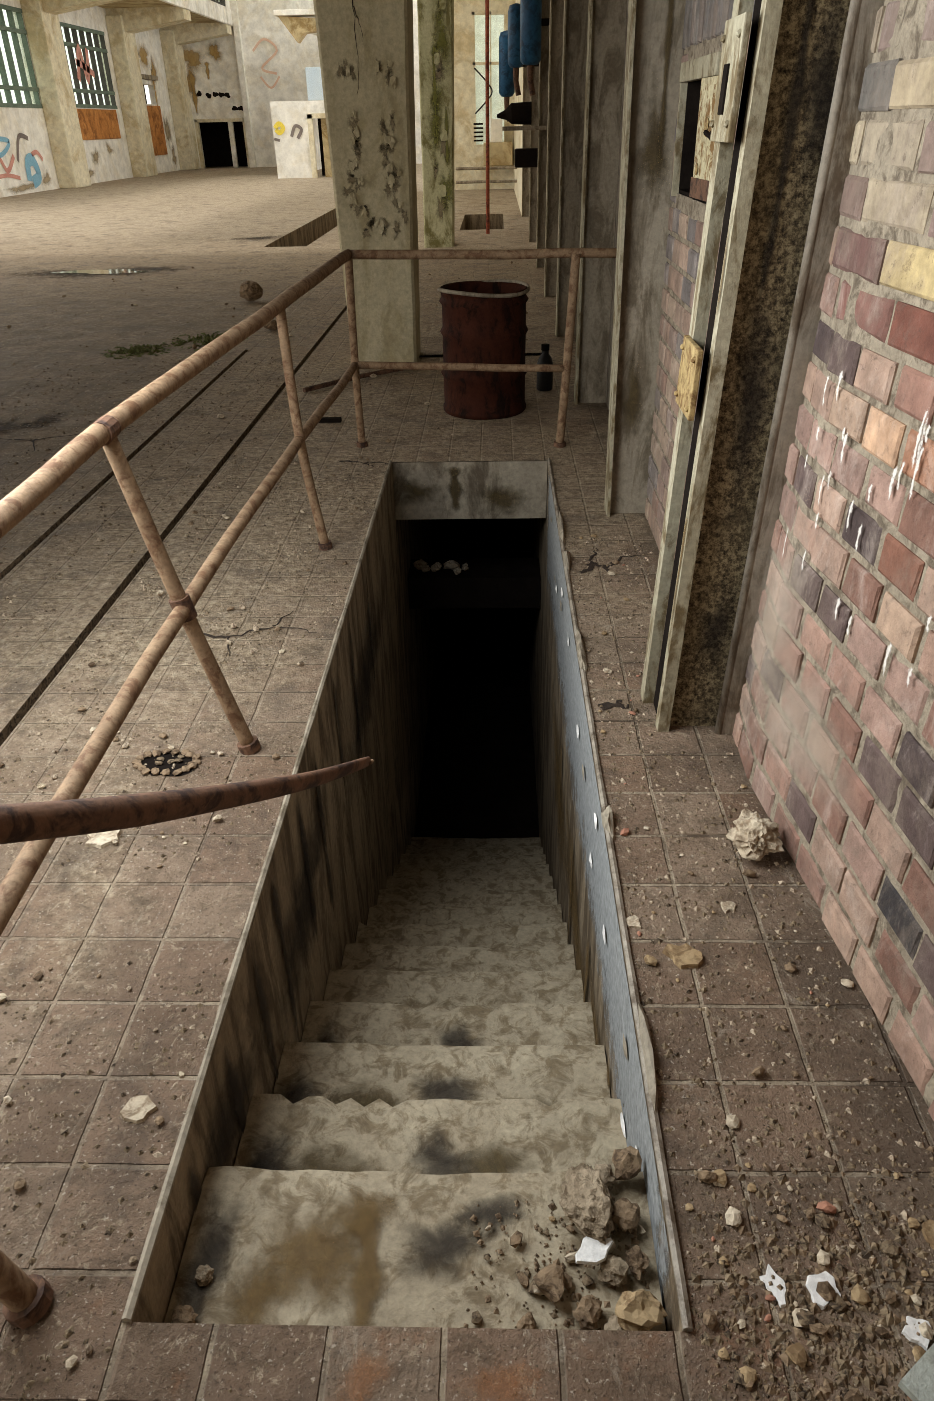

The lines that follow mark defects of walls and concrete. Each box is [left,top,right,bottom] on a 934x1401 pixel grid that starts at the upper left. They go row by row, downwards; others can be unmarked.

damp [431,45,449,165]
damp [450,468,461,509]
damp [484,489,520,508]
damp [815,428,848,529]
damp [847,485,872,549]
damp [888,411,931,499]
damp [415,1197,519,1269]